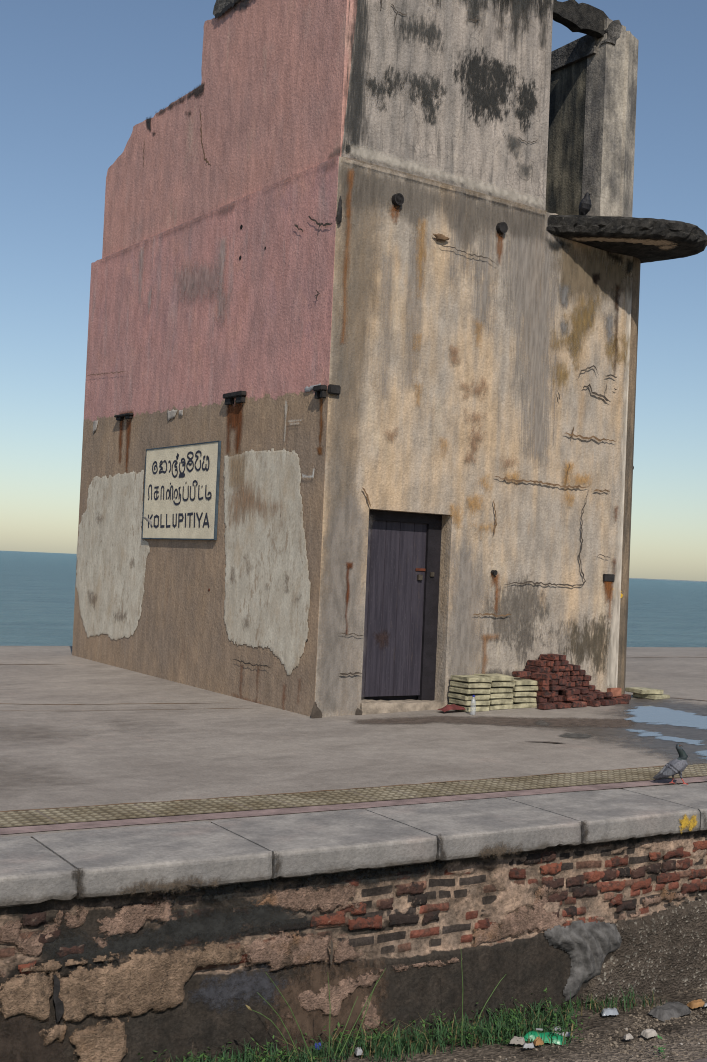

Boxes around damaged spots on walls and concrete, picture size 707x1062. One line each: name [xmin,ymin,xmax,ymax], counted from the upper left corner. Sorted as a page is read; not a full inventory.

water stain [321,0,634,459]
rust [119,412,133,471]
rust [227,403,243,455]
crack [557,365,617,402]
crack [566,427,616,442]
peeling [76,470,150,640]
peeling [223,448,311,675]
crack [493,464,610,587]
water stain [324,499,707,772]
peeling [18,869,243,1046]
flaking render [269,882,440,963]
flaking render [480,840,707,918]